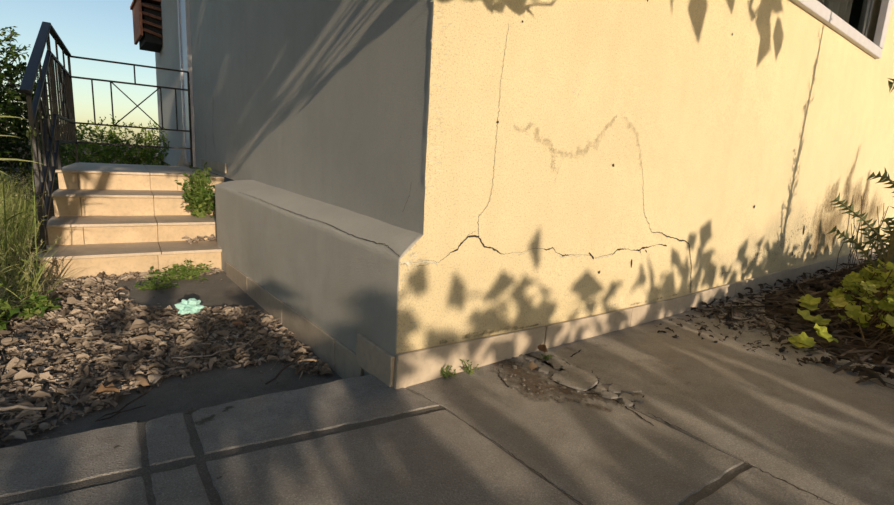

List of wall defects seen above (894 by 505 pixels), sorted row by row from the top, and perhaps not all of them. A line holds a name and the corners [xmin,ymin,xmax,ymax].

crack [240,27,692,292]